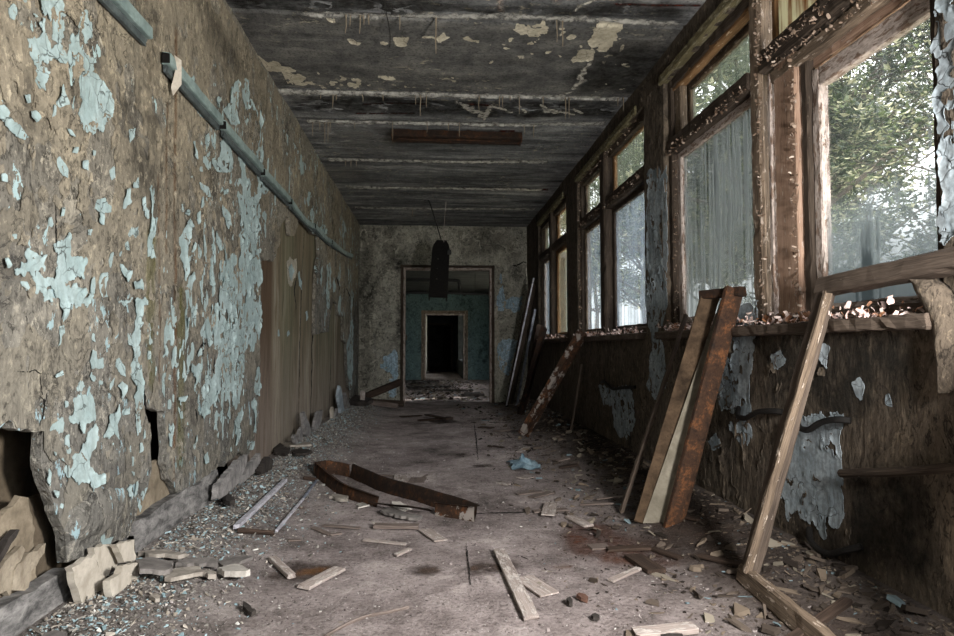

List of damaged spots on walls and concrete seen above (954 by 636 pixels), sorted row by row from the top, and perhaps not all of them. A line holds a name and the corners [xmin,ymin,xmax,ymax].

peeling [930,0,954,246]
flaking render [0,0,877,546]
flaking render [828,278,954,393]